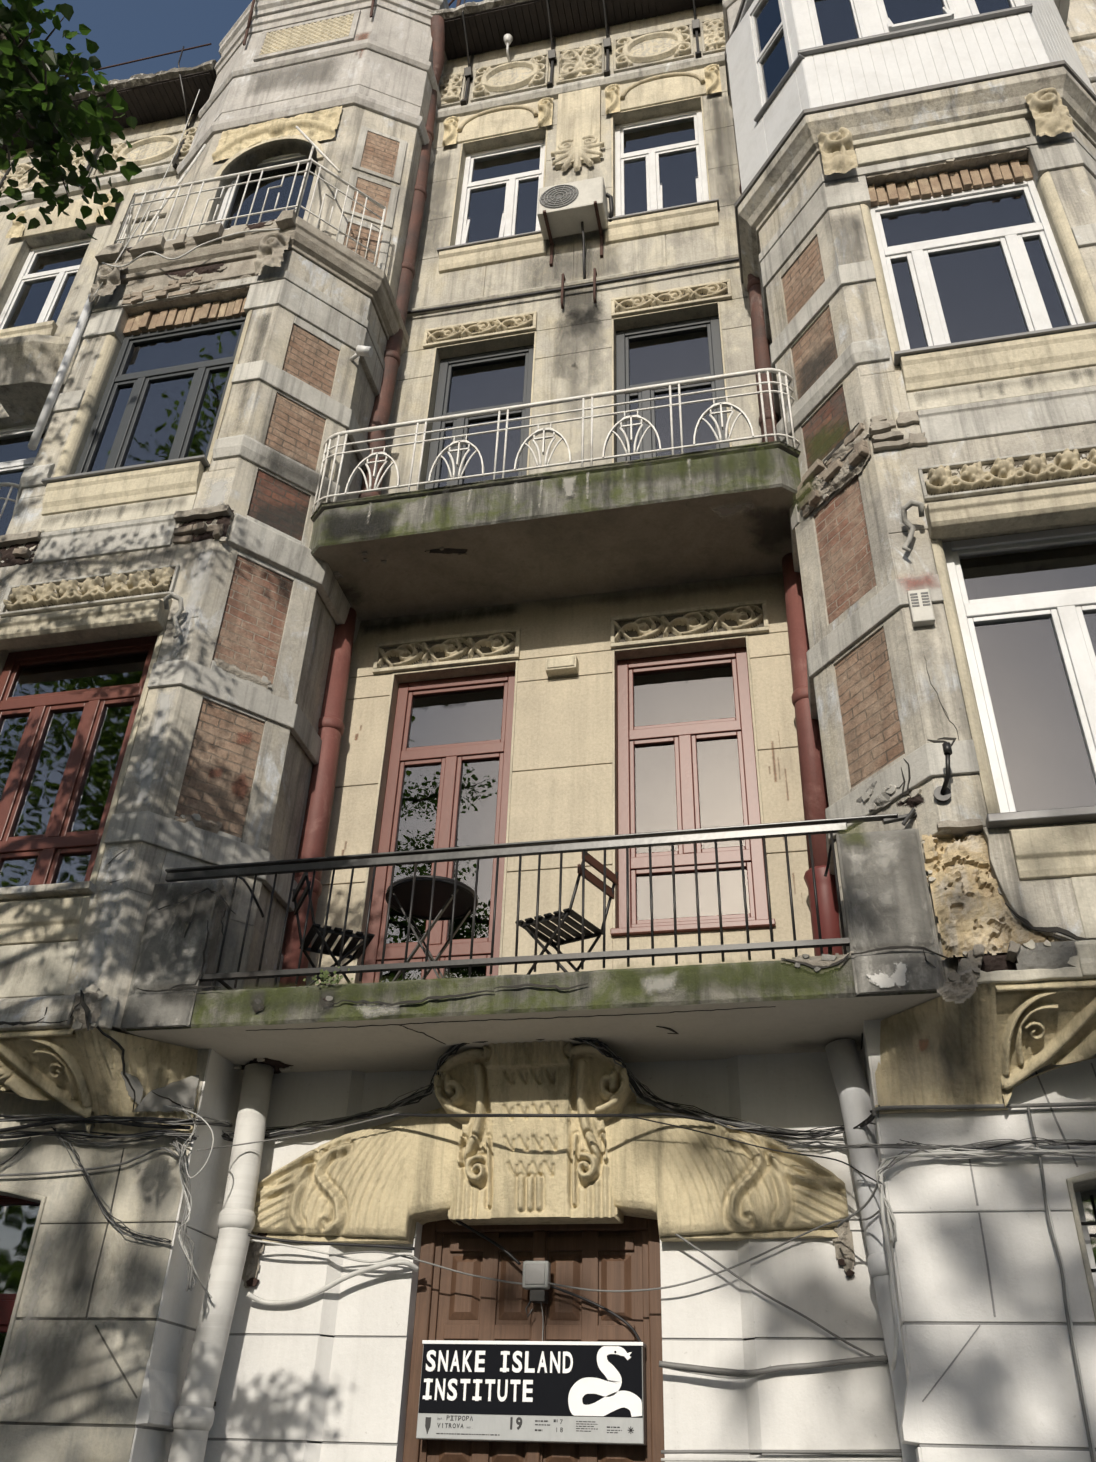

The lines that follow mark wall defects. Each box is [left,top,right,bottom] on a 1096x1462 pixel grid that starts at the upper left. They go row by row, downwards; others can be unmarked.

damp [563,290,599,333]
spalling [796,411,928,518]
damp [564,478,588,495]
spalling [922,819,1080,981]
damp [645,978,672,990]
peeling [866,962,910,988]
crack [0,990,192,1112]